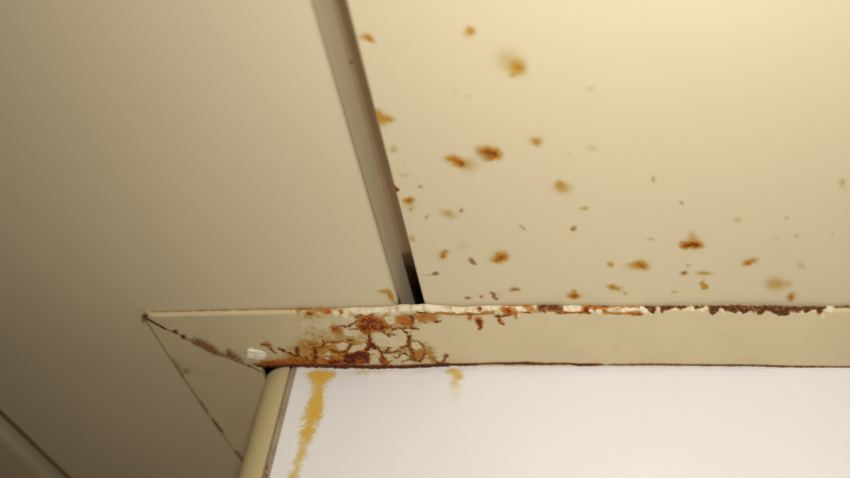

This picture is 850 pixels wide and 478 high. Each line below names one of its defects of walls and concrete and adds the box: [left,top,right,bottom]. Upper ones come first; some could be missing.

corrosion [508,60,525,77]
corrosion [375,110,393,125]
corrosion [477,146,502,161]
corrosion [446,155,469,168]
corrosion [680,237,703,249]
corrosion [492,252,508,263]
corrosion [631,260,648,269]
peeling [332,304,546,319]
peeling [563,305,640,314]
corrosion [152,290,850,478]